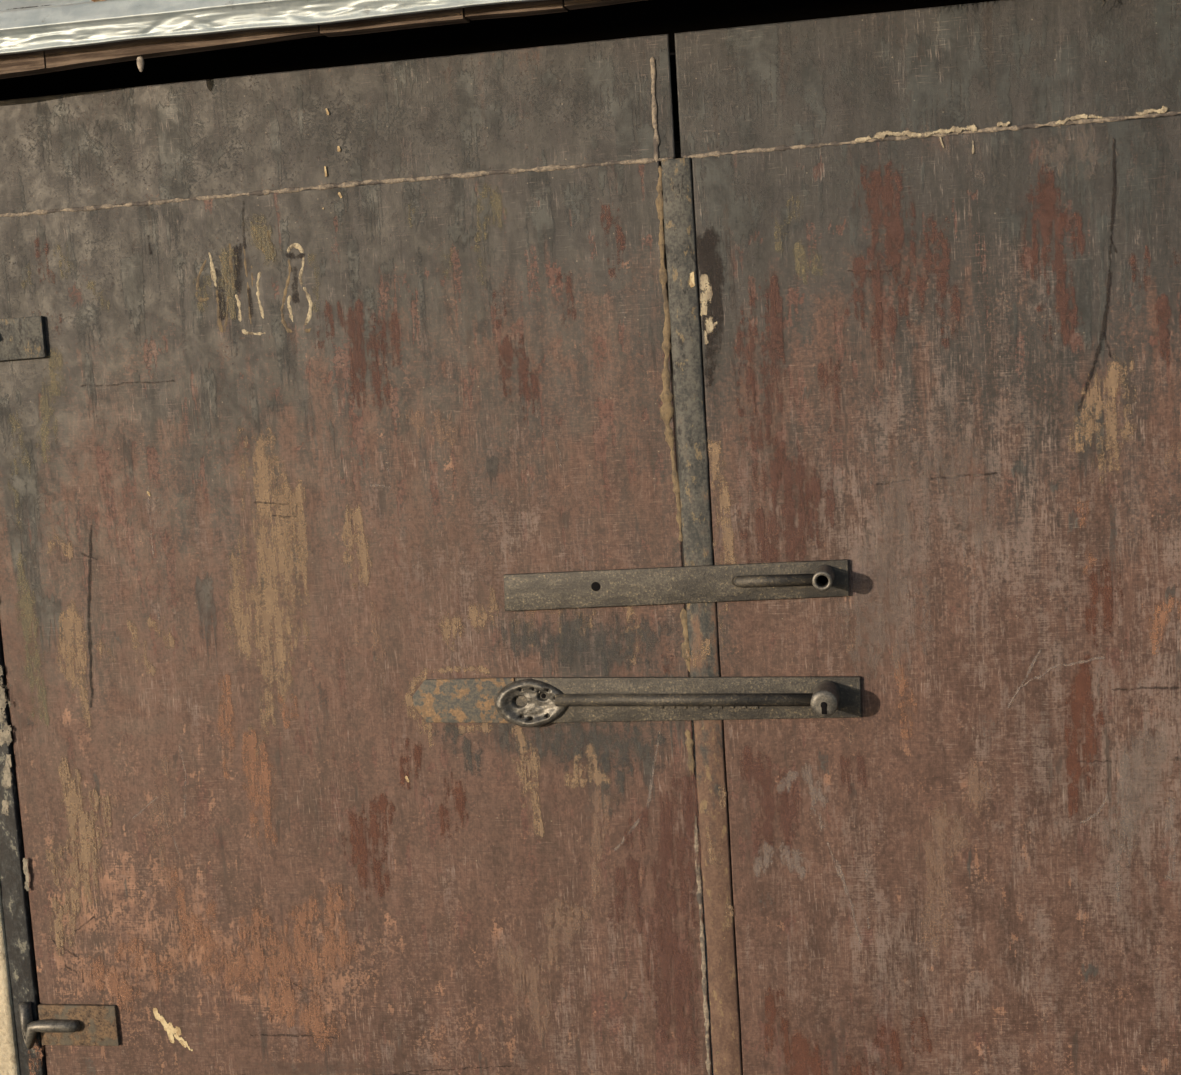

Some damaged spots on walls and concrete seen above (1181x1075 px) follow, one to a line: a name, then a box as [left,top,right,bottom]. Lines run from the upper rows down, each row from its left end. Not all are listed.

corrosion [734,274,835,564]
peeling [0,666,13,816]
peeling [217,427,310,848]
corrosion [1064,560,1123,818]
peeling [46,757,112,956]
corrosion [342,793,395,900]
peeling [80,862,358,1051]